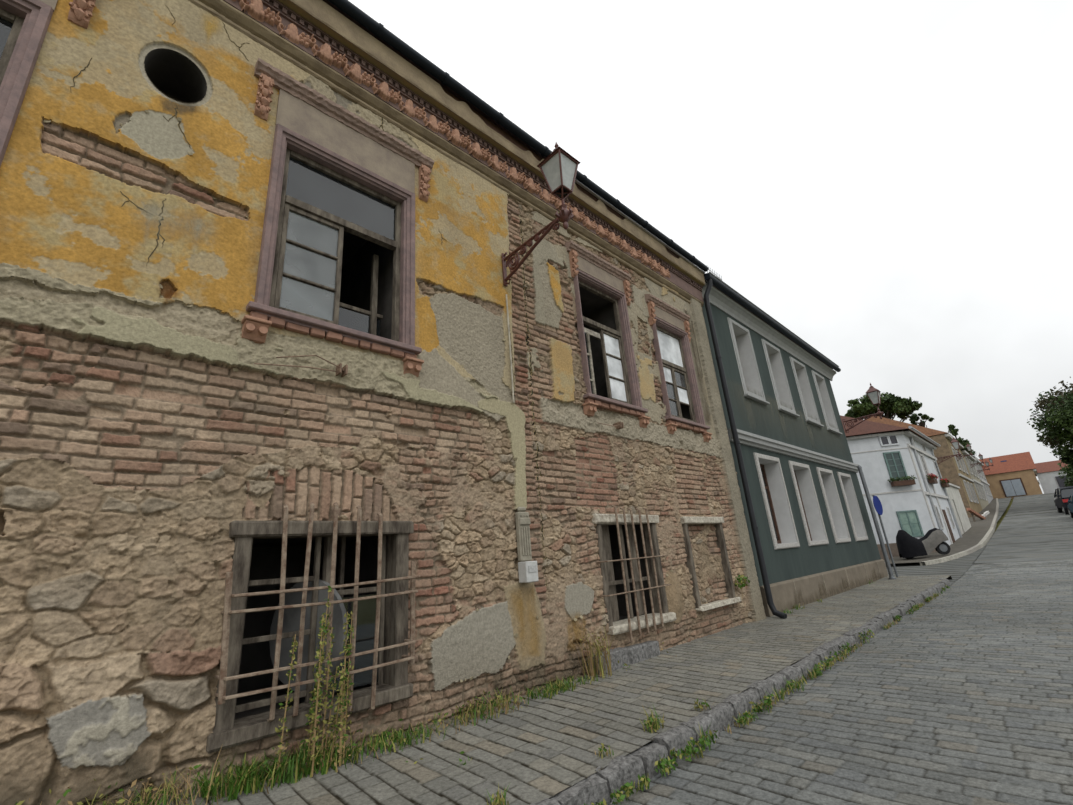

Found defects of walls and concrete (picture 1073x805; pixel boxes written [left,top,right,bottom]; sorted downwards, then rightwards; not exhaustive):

spalling [41,109,251,221]
spalling [0,194,645,621]
peeling [430,600,518,691]